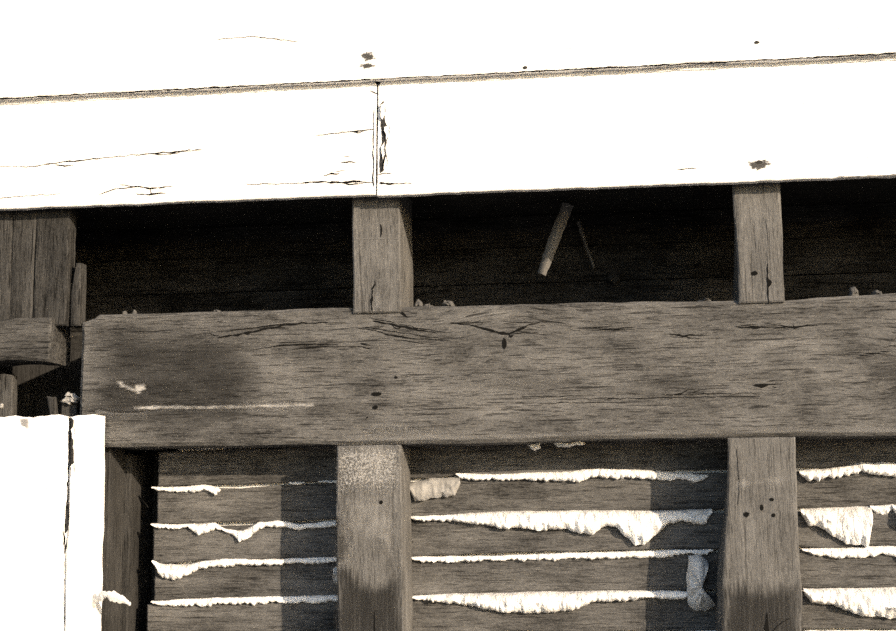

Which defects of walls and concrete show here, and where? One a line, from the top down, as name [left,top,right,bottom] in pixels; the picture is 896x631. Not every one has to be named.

crack [209,311,543,350]
crack [63,417,71,625]